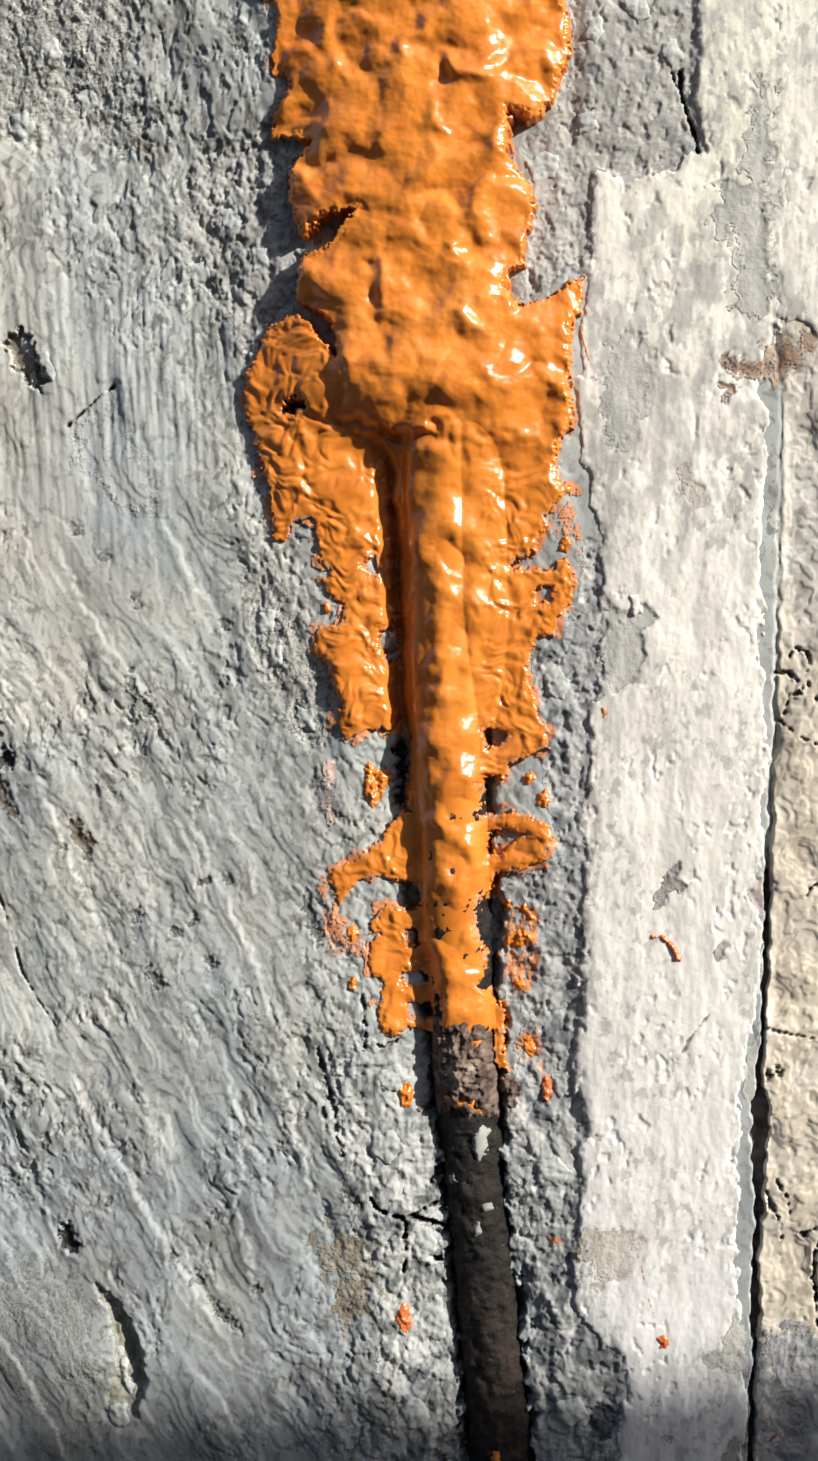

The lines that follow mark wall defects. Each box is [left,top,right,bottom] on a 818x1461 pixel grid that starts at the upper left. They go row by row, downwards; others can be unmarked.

crack [670,69,701,155]
peeling [704,72,784,322]
hole [2,326,57,394]
crack [774,646,818,745]
flaking render [652,860,688,910]
flaking render [747,871,777,913]
crack [316,1050,345,1158]
corrosion [416,1016,522,1119]
peeling [742,1035,783,1104]
crack [747,868,818,1461]
hole [57,1224,80,1253]
crack [367,1191,453,1273]